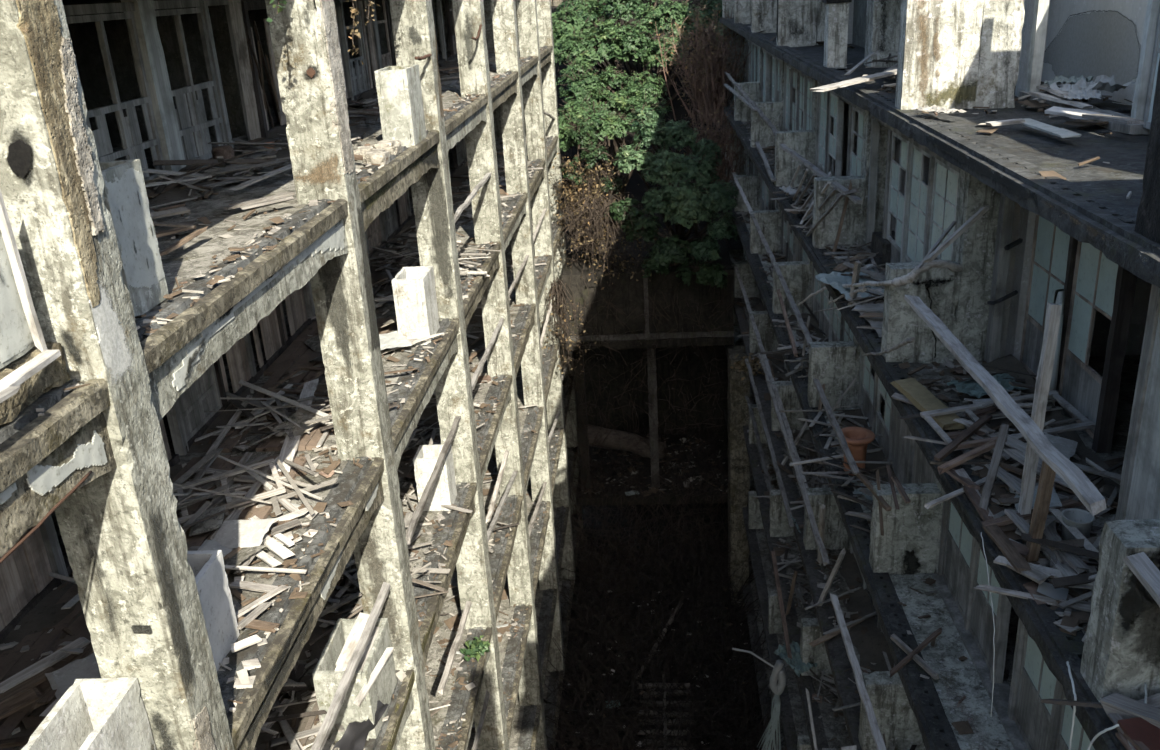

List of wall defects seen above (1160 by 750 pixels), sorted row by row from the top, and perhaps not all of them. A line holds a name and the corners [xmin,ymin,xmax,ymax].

rust [304,66,319,80]
peeling [1043,10,1141,85]
spalling [6,130,33,186]
spalling [16,0,165,307]
peeling [0,430,107,564]
leakage [1148,553,1160,571]
leakage [1115,570,1160,663]